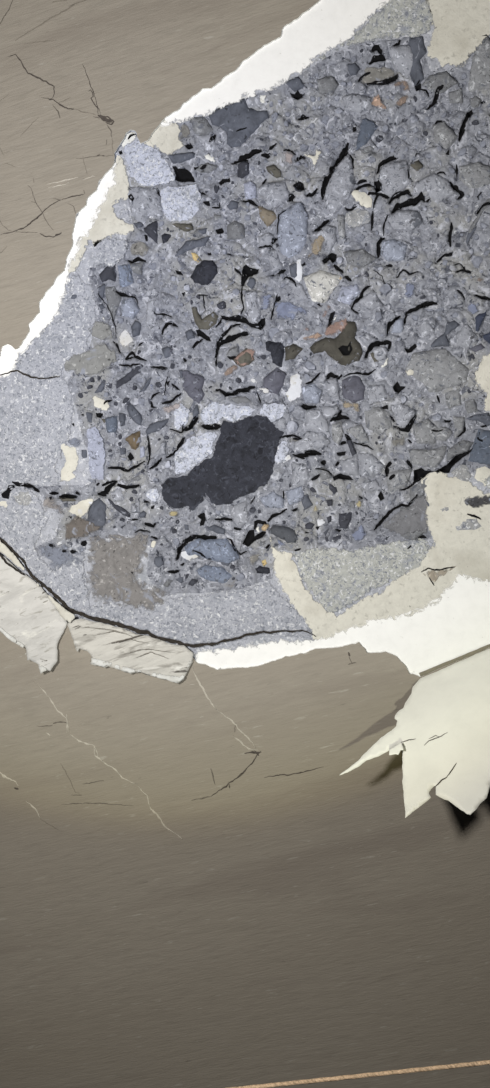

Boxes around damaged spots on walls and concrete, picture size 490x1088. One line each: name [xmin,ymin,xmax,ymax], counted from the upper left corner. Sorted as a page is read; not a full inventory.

crack [0,54,114,253]
spalling [0,0,490,684]
crack [0,538,316,751]
crack [0,772,58,830]
crack [35,683,183,840]
peeling [389,742,404,755]